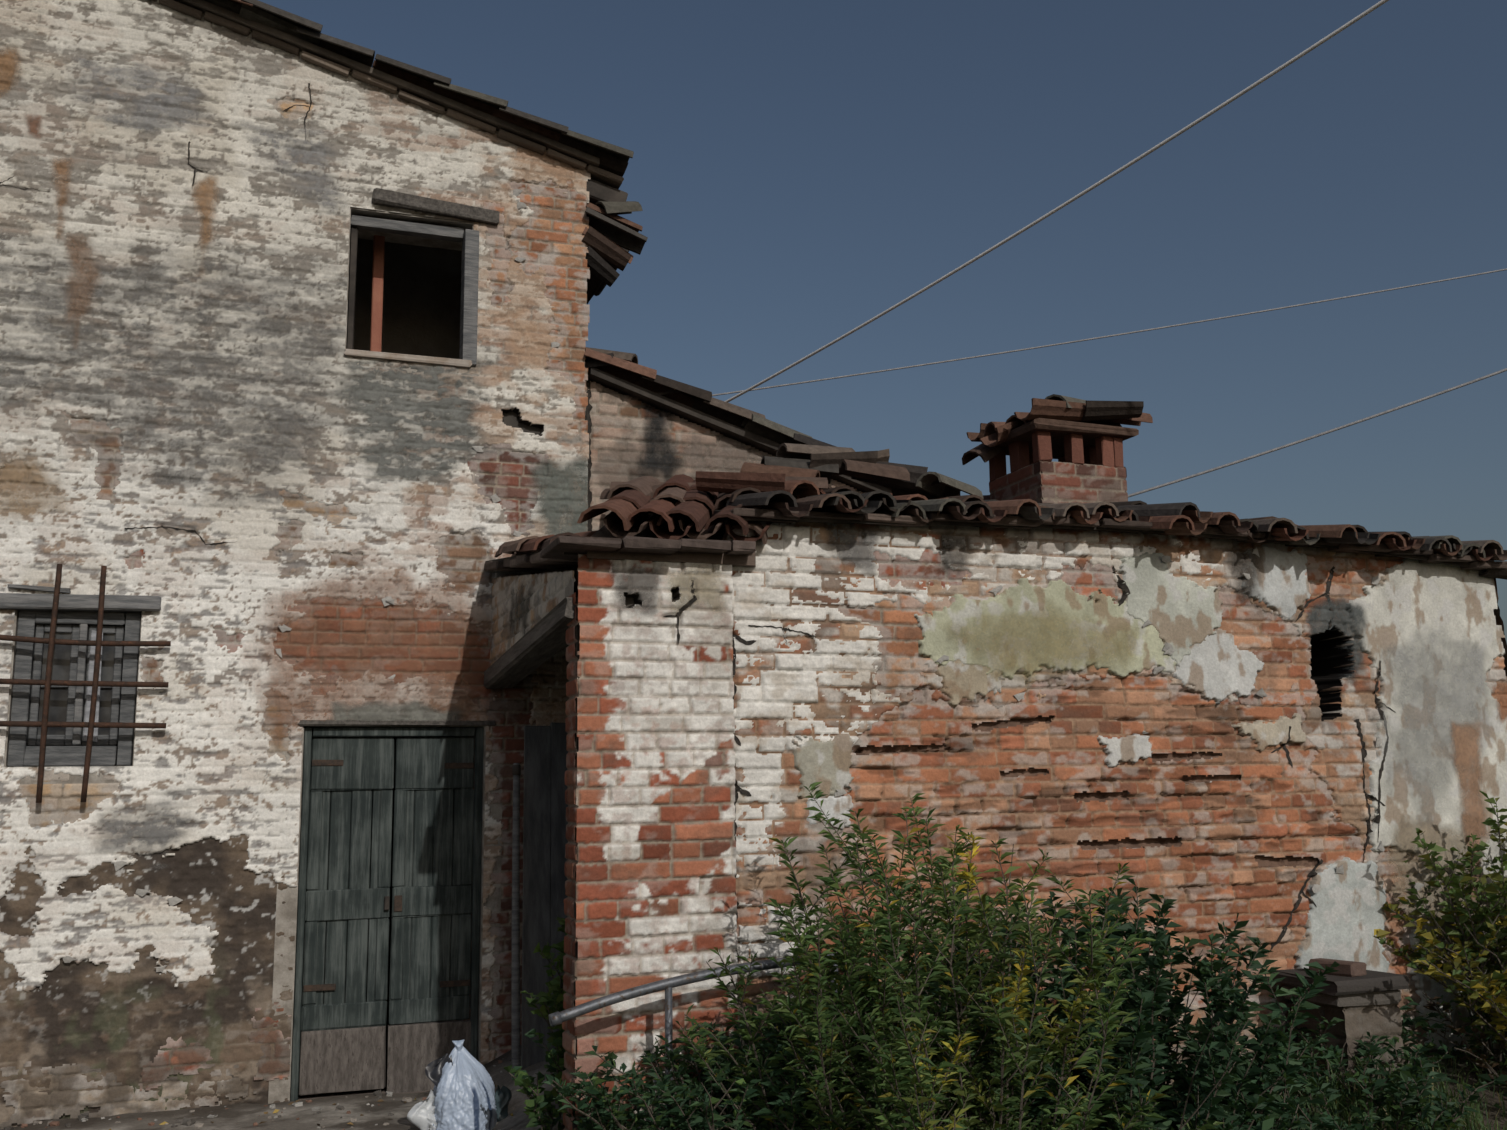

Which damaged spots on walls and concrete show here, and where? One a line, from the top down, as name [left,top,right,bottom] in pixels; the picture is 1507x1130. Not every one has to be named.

spalling [483,179,590,443]
spalling [624,592,642,608]
spalling [670,587,681,602]
crack [663,580,697,645]
damp [965,613,1133,675]
spalling [19,770,119,827]
spalling [272,407,549,1059]
spalling [774,544,1507,1051]
crack [1271,726,1293,768]
crack [1355,660,1396,862]
crack [1271,859,1323,950]
flaking render [0,834,295,1129]